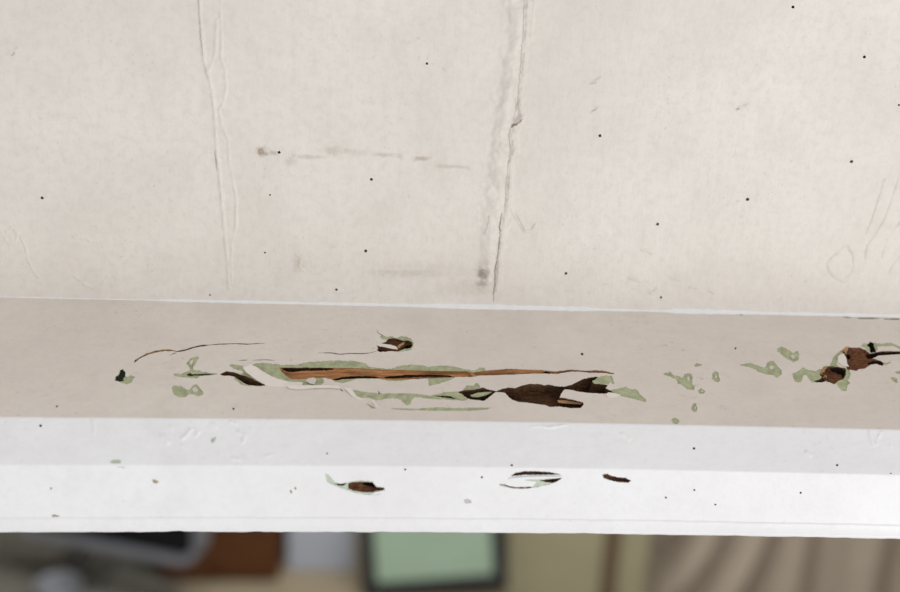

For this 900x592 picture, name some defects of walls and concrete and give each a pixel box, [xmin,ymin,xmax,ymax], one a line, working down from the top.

crack [466,0,538,301]
spalling [377,336,413,352]
peeling [115,369,135,384]
peeling [172,357,492,411]
peeling [664,364,705,412]
peeling [741,347,799,378]
peeling [876,355,900,383]
peeling [499,471,562,489]